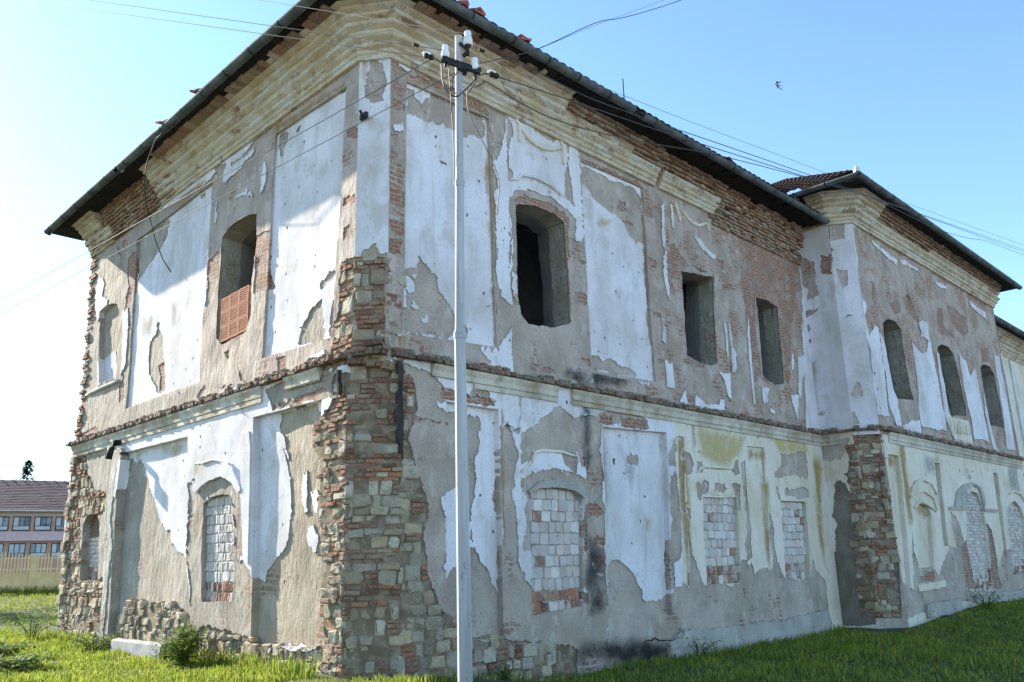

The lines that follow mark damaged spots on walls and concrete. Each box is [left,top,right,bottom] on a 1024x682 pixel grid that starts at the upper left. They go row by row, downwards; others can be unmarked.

flaking render [150,4,335,158]
flaking render [412,1,547,77]
spalling [56,61,513,679]
spalling [467,97,1024,682]
damp [587,546,602,608]